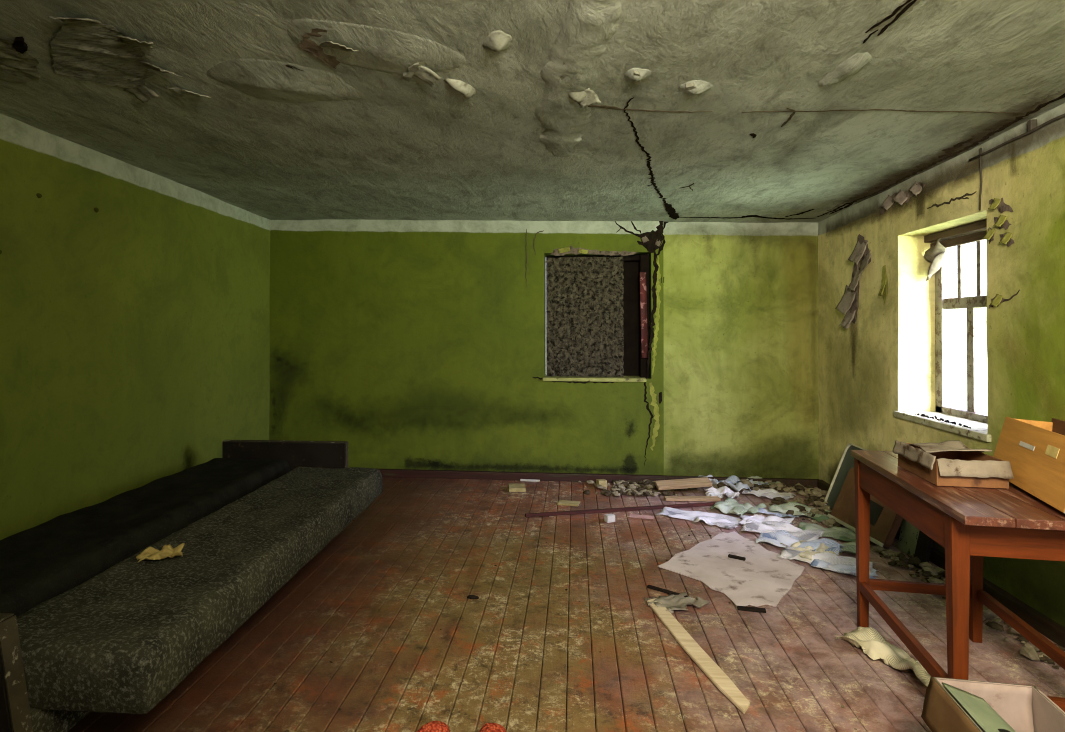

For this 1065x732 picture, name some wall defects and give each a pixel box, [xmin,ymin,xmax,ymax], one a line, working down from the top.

crack [863,0,921,43]
flaking render [0,16,211,103]
peeling [298,28,359,69]
crack [742,88,1065,177]
crack [927,192,976,209]
peeling [983,198,1014,247]
crack [588,97,864,465]
peeling [835,234,888,329]
leakage [406,456,636,473]